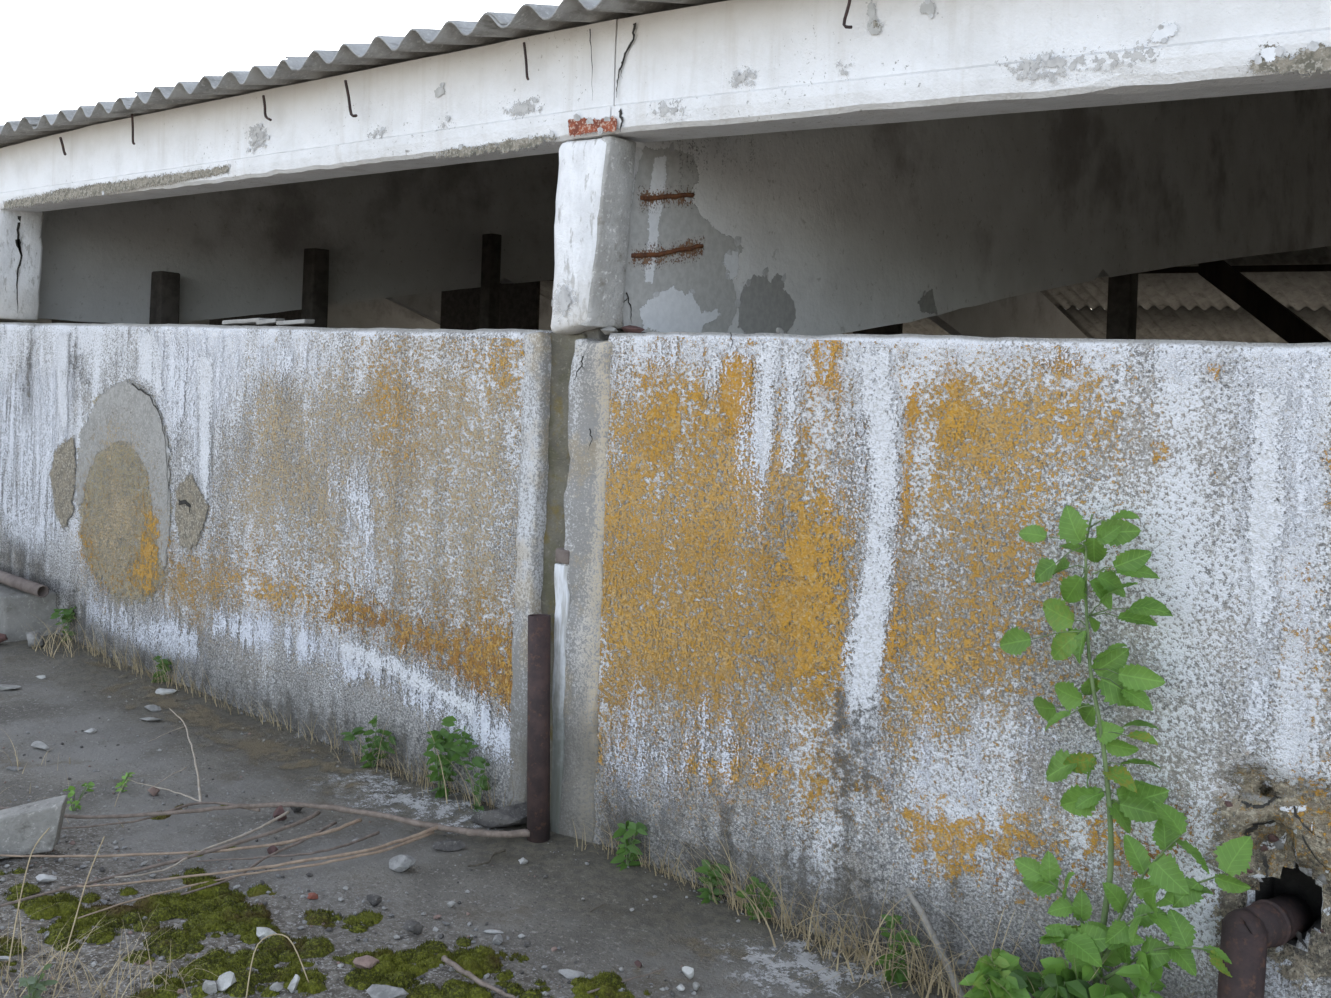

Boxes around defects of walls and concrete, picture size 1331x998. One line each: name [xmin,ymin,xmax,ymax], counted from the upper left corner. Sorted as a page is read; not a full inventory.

crack [589,23,636,132]
spalling [1246,41,1331,77]
crack [15,216,23,306]
spalling [2,164,231,209]
spalling [435,114,617,159]
rust [637,186,695,212]
rust [631,237,704,269]
peeling [623,142,796,334]
peeling [49,377,209,622]
damp [0,325,513,835]
damp [596,336,1329,998]
spalling [1190,750,1331,998]